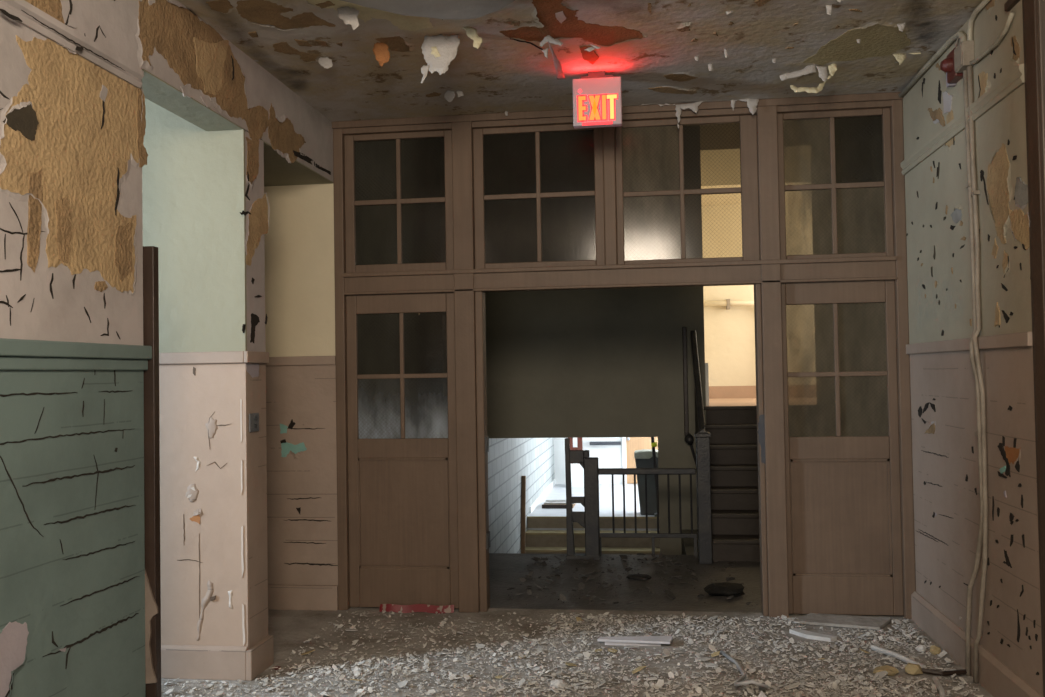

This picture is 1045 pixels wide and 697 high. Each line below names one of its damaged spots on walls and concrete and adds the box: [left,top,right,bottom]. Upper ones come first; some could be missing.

flaking render [206,0,359,69]
peeling [373,26,482,102]
flaking render [499,0,648,79]
flaking render [0,35,148,296]
flaking render [135,0,331,298]
flaking render [979,140,1031,291]
crack [0,202,120,339]
peeling [242,313,268,343]
crack [0,370,135,560]
crack [61,576,139,606]
peeling [0,621,29,697]
crack [43,613,139,669]